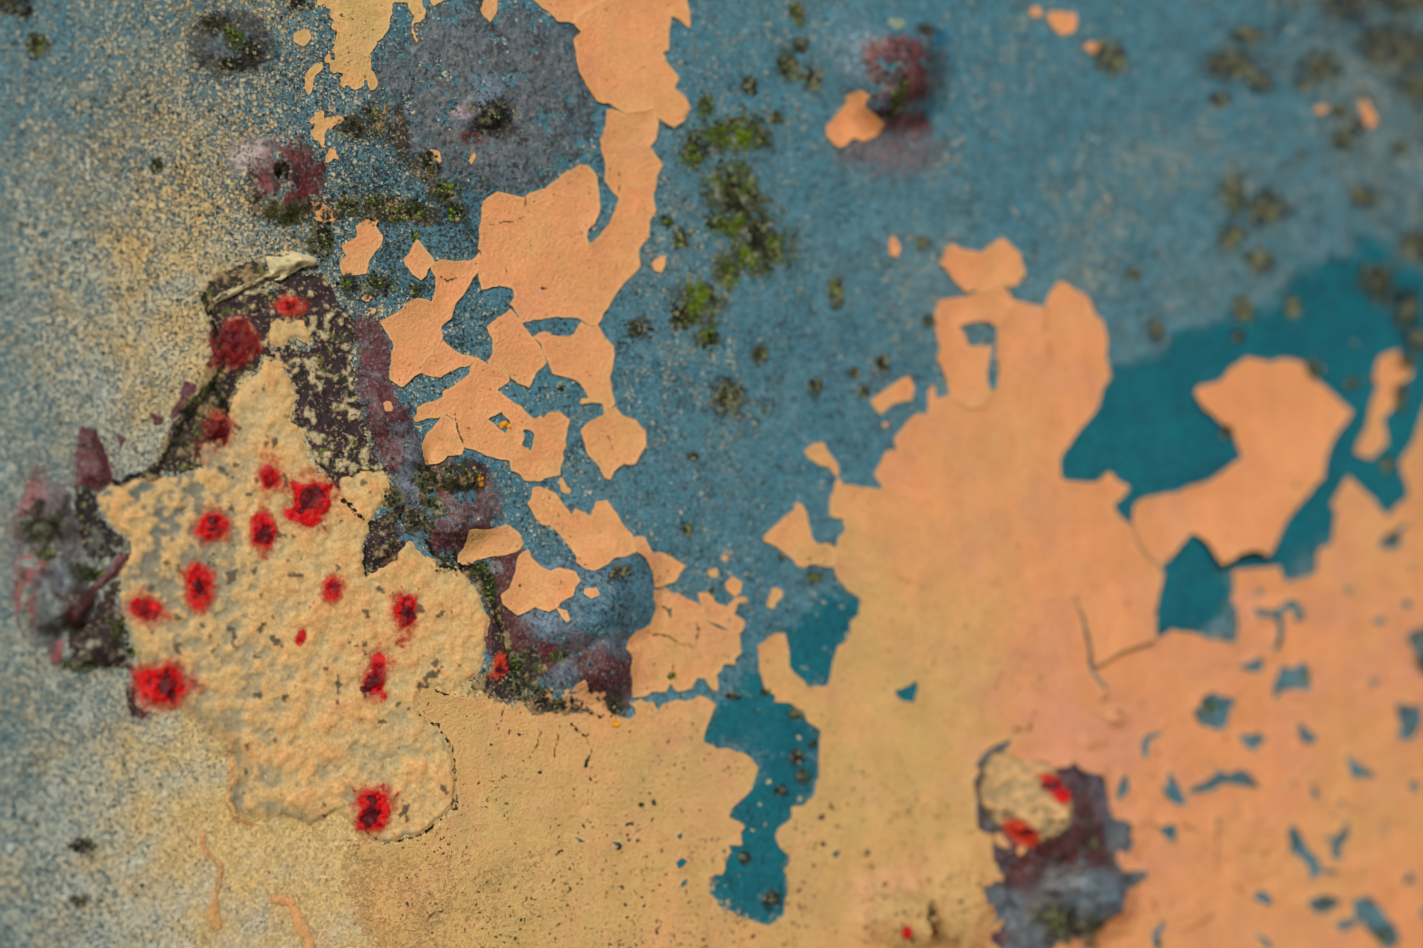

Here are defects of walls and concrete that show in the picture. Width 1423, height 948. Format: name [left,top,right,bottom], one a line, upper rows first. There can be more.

peeling [293,29,311,46]
peeling [305,0,443,95]
mould [1293,0,1423,153]
peeling [310,110,354,163]
peeling [311,202,336,223]
peeling [340,219,383,276]
peeling [380,0,691,494]
mould [1352,227,1423,418]
peeling [73,233,1423,948]